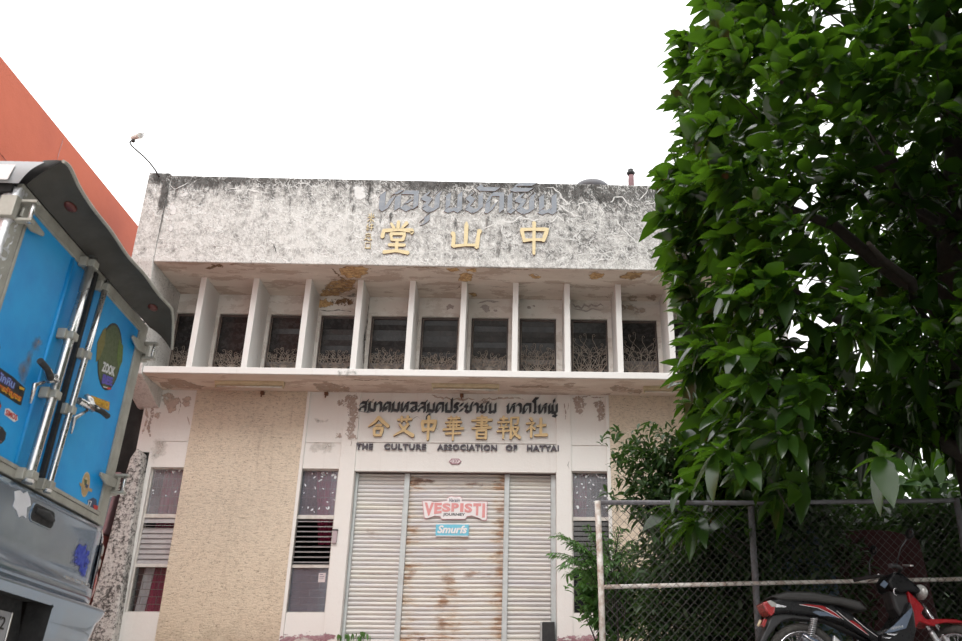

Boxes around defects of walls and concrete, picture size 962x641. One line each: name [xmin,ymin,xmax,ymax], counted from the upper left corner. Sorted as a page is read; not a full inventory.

damp [409,181,478,192]
damp [490,182,664,211]
peeling [150,376,204,418]
peeling [313,379,406,444]
peeling [564,383,642,421]